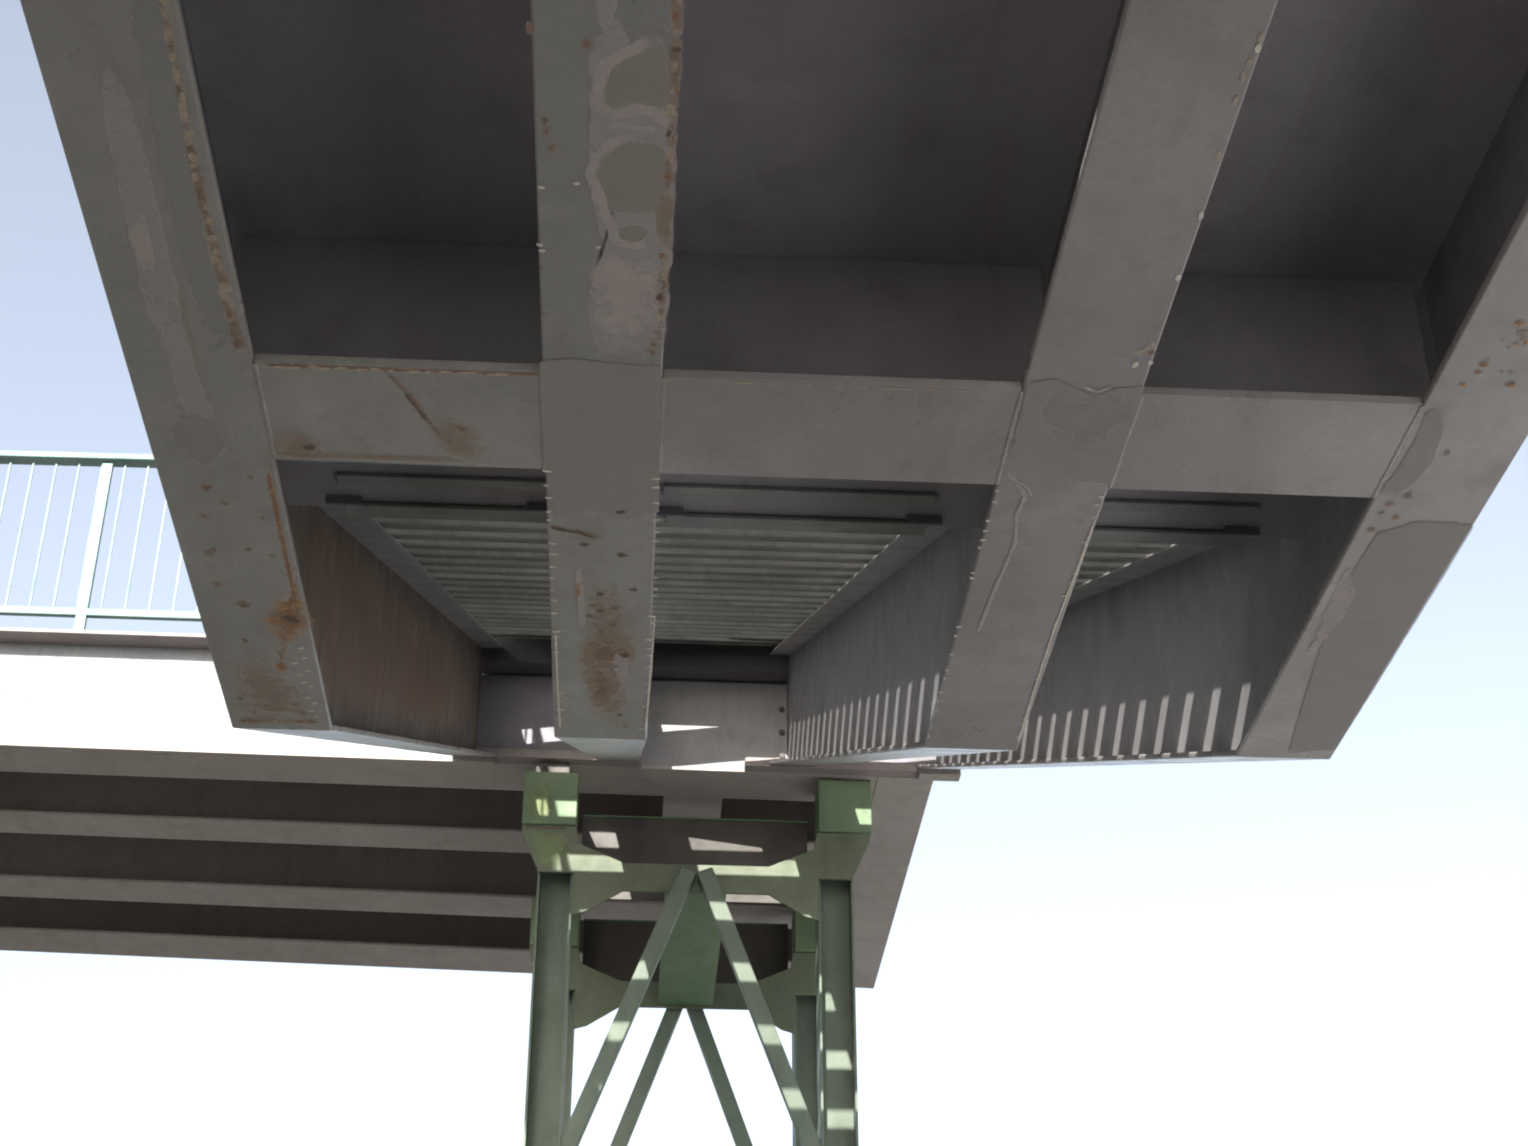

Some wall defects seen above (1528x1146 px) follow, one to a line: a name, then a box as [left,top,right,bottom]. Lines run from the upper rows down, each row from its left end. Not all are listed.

corrosion [159,0,245,349]
peeling [540,0,677,542]
corrosion [648,0,684,356]
corrosion [260,363,540,459]
leakage [0,722,85,751]
corrosion [247,474,312,672]
corrosion [551,526,602,547]
corrosion [575,570,637,727]